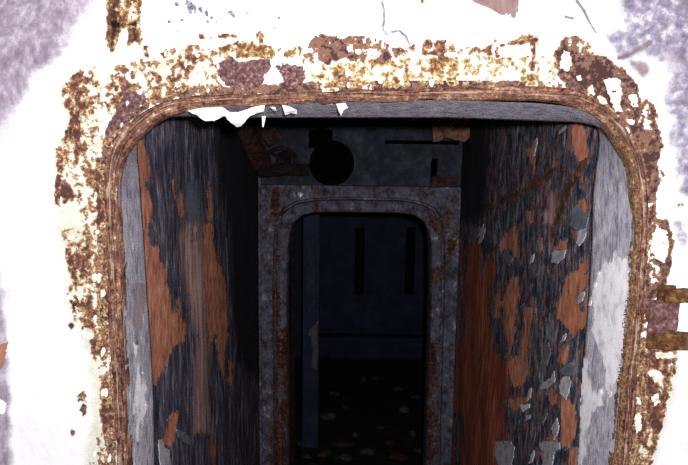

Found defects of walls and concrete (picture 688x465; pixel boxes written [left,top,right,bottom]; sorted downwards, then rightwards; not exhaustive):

leakage [605,0,688,76]
peeling [158,410,192,465]
peeling [133,139,234,442]
peeling [188,105,297,127]
rust [54,31,551,465]
peeling [451,223,629,465]
peeling [529,199,591,264]
peeling [558,122,589,162]
rust [547,35,675,310]
rust [611,270,631,441]
rust [628,312,678,465]
leakage [665,71,688,195]